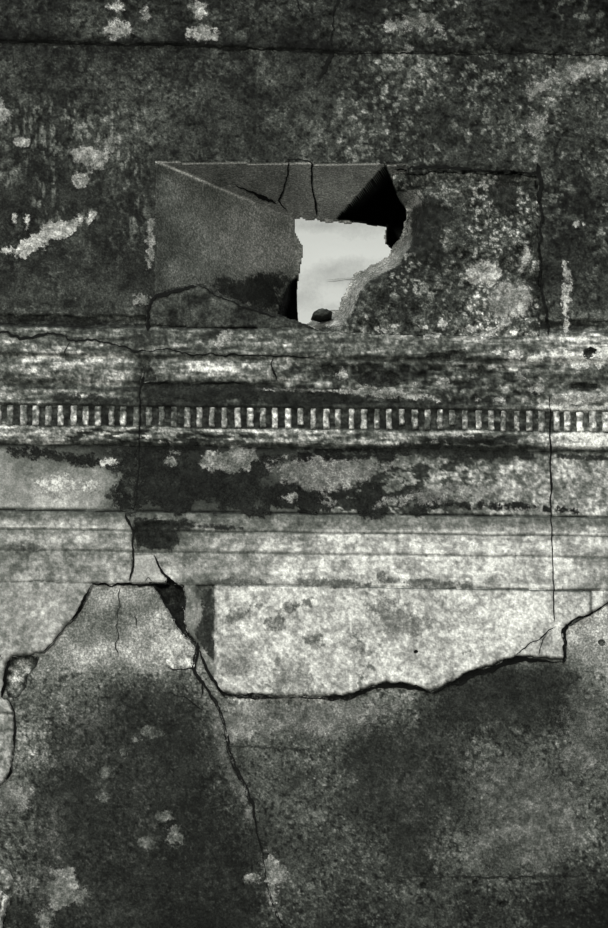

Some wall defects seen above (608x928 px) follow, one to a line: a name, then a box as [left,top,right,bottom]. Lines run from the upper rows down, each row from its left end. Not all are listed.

water stain [200,443,258,474]
water stain [423,435,518,445]
water stain [432,499,579,514]
spalling [131,530,197,646]
spalling [5,655,39,698]
water stain [222,657,400,744]
crack [168,397,608,928]
water stain [0,785,34,816]
water stain [137,811,184,850]
water stain [465,690,608,875]
water stain [34,867,87,928]
water stain [244,850,291,925]